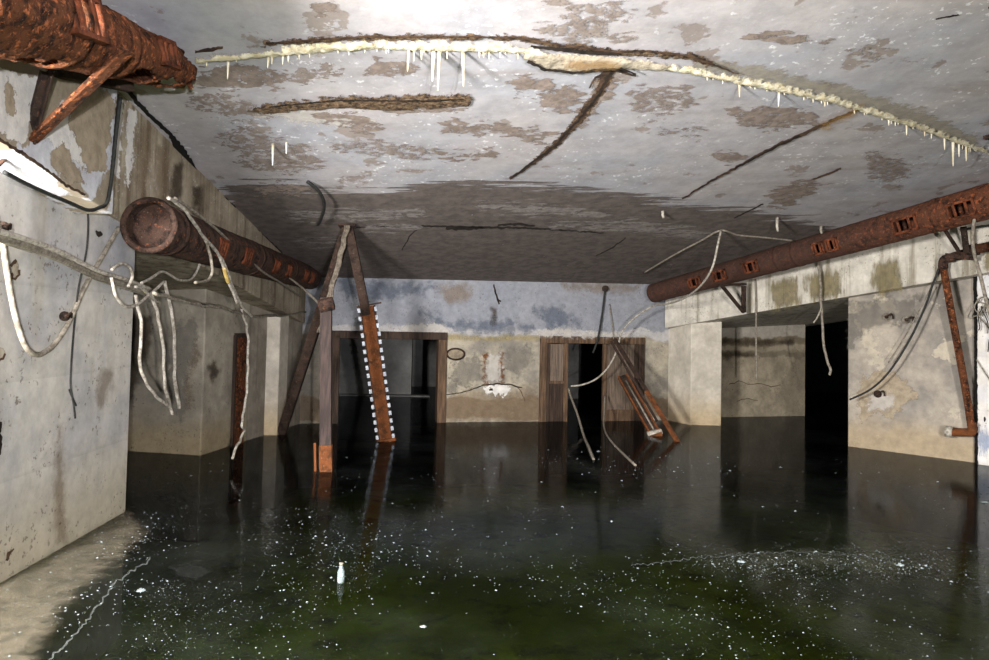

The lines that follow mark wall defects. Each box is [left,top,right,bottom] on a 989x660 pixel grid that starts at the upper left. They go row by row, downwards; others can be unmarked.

peeling [0,67,38,145]
peeling [43,89,117,185]
crack [195,32,989,199]
efflorescence [695,61,976,144]
damp [218,179,836,284]